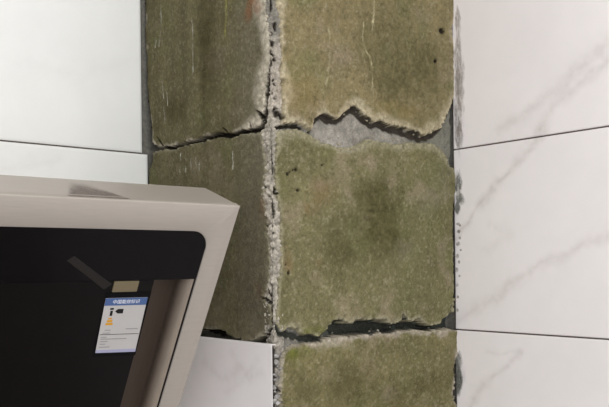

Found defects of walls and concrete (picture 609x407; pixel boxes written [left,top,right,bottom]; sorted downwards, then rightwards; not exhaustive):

crack [151,69,447,150]
spalling [272,108,451,167]
crack [202,329,231,337]
crack [262,289,429,342]